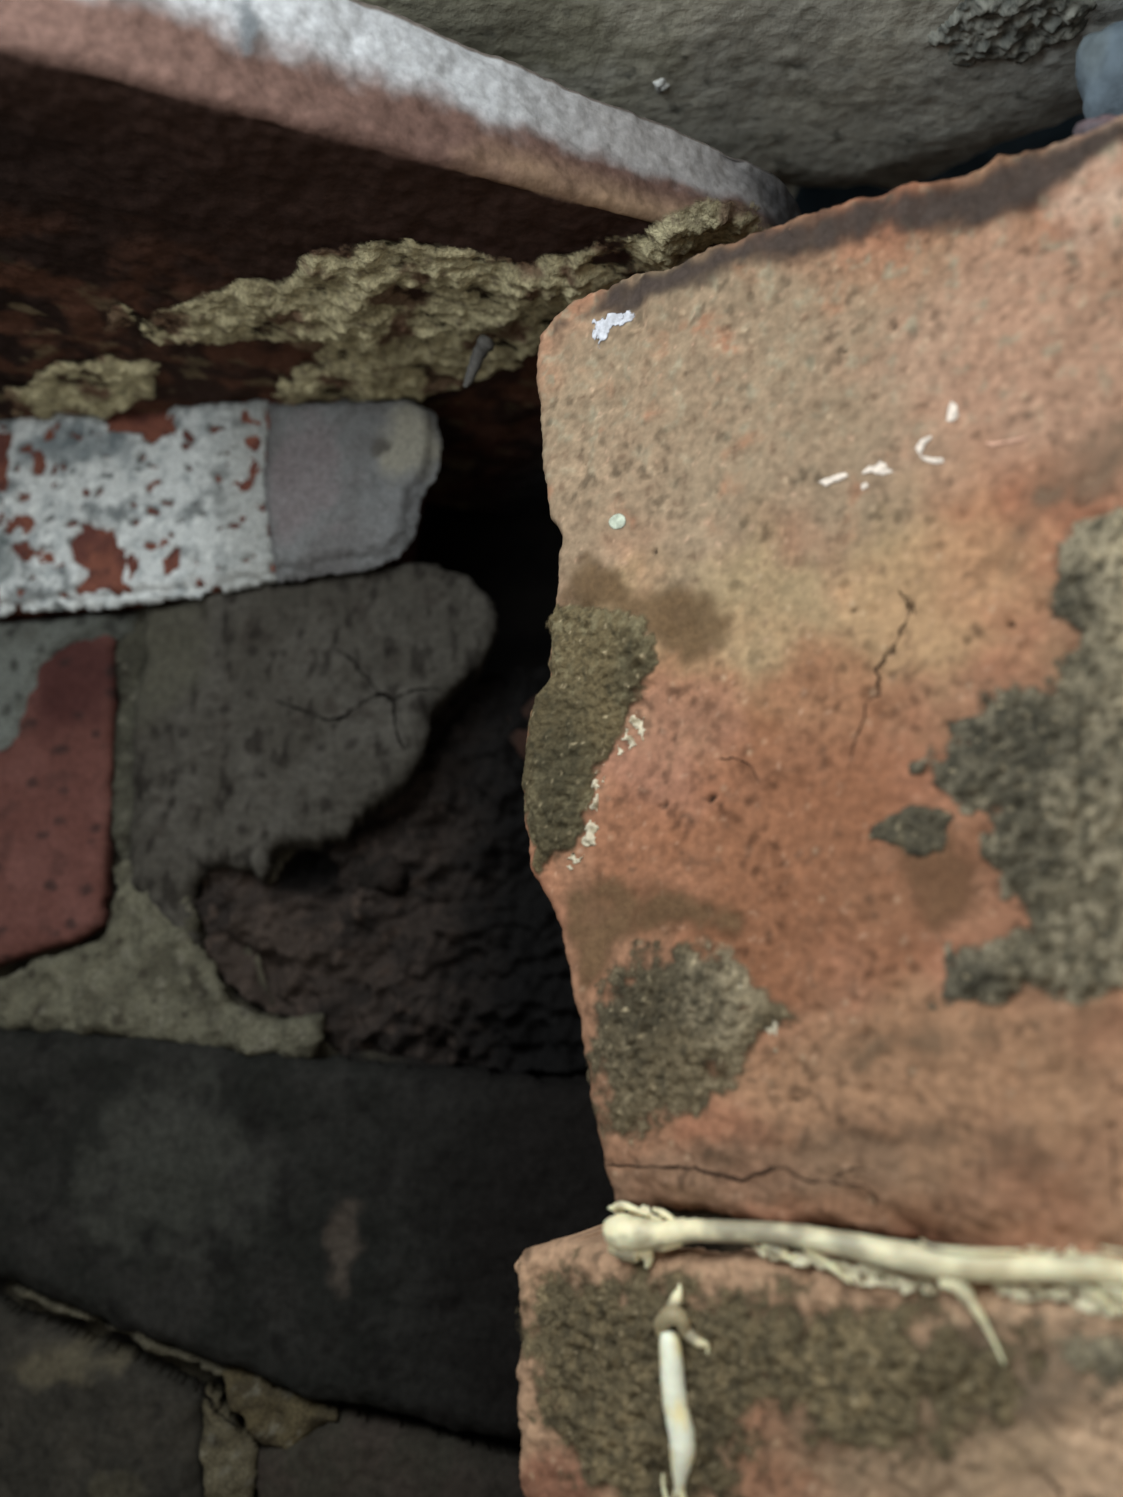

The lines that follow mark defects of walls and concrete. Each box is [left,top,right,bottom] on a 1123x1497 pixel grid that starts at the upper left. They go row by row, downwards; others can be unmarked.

spalling [928,0,1097,67]
peeling [103,303,136,332]
peeling [0,355,277,617]
crack [850,589,916,760]
leakage [763,1020,779,1053]
crack [606,1164,878,1207]